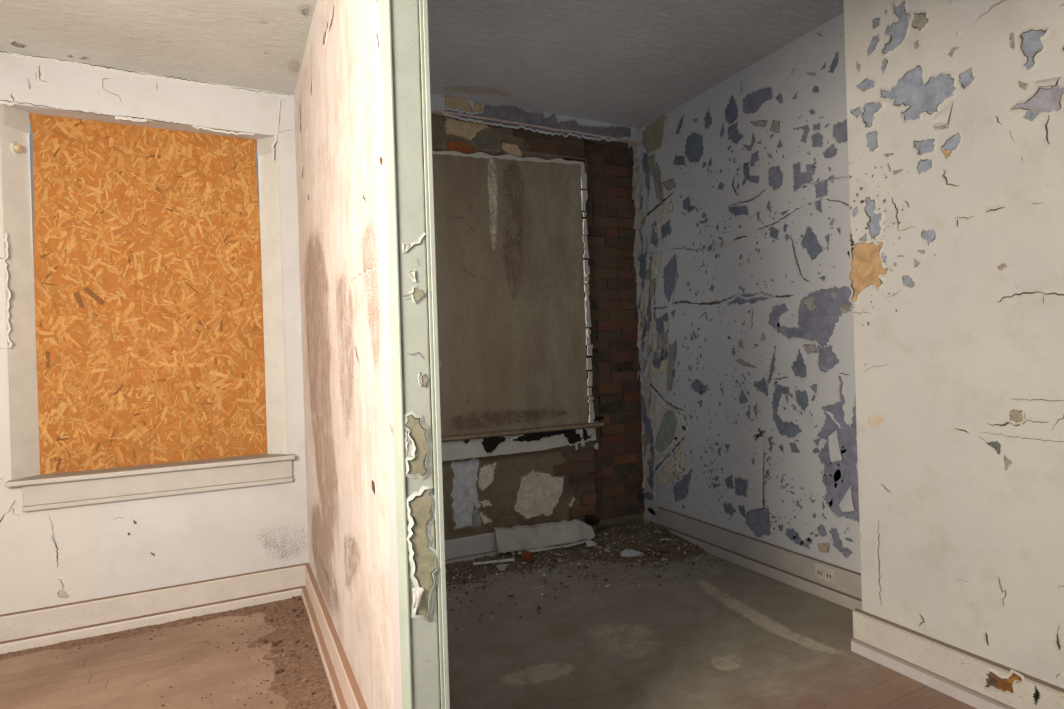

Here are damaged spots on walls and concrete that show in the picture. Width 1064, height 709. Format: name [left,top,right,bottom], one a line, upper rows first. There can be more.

peeling [1008,25,1064,146]
crack [954,203,1005,227]
peeling [404,262,426,304]
flaking render [441,0,977,560]
crack [997,270,1064,307]
water stain [256,210,384,630]
peeling [978,433,1013,471]
crack [954,399,1064,442]
peeling [388,411,439,622]
crack [48,513,71,599]
peeling [985,671,1022,693]
crack [1051,628,1064,697]